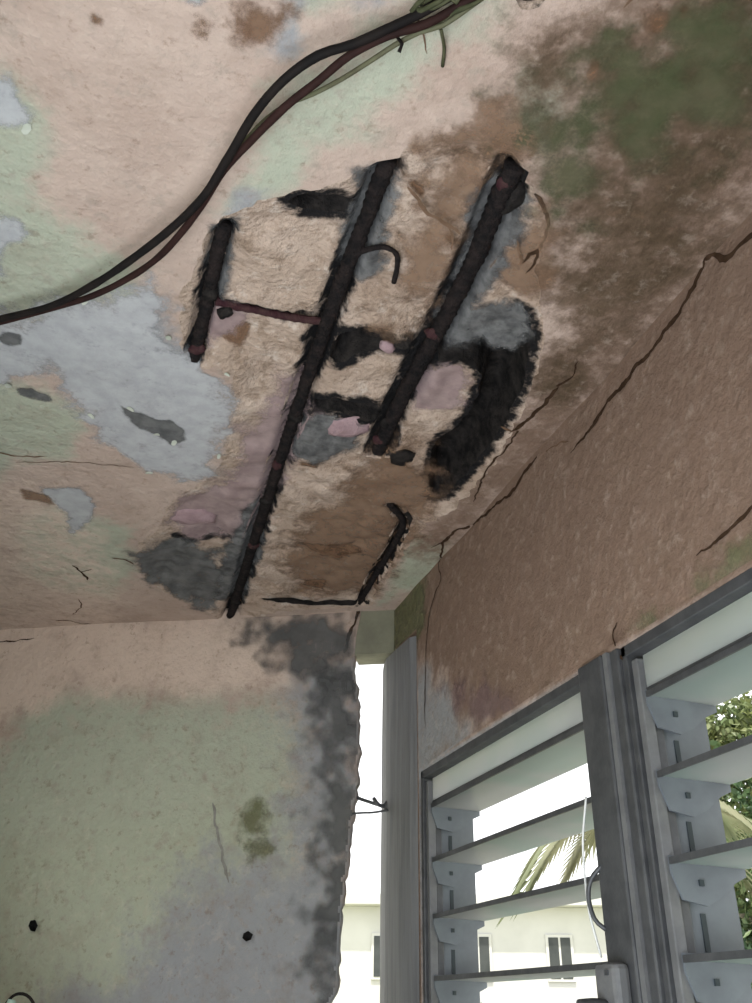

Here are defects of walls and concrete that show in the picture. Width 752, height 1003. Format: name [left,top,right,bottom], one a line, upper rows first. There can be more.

peeling [0,77,32,135]
rust [208,295,246,339]
rust [166,366,324,540]
spalling [0,133,546,619]
water stain [292,412,359,465]
rust [280,441,443,596]
water stain [354,167,400,282]
rust [415,363,468,410]
water stain [444,192,531,350]
crack [516,193,550,274]
crack [424,232,752,726]
water stain [240,614,357,1003]